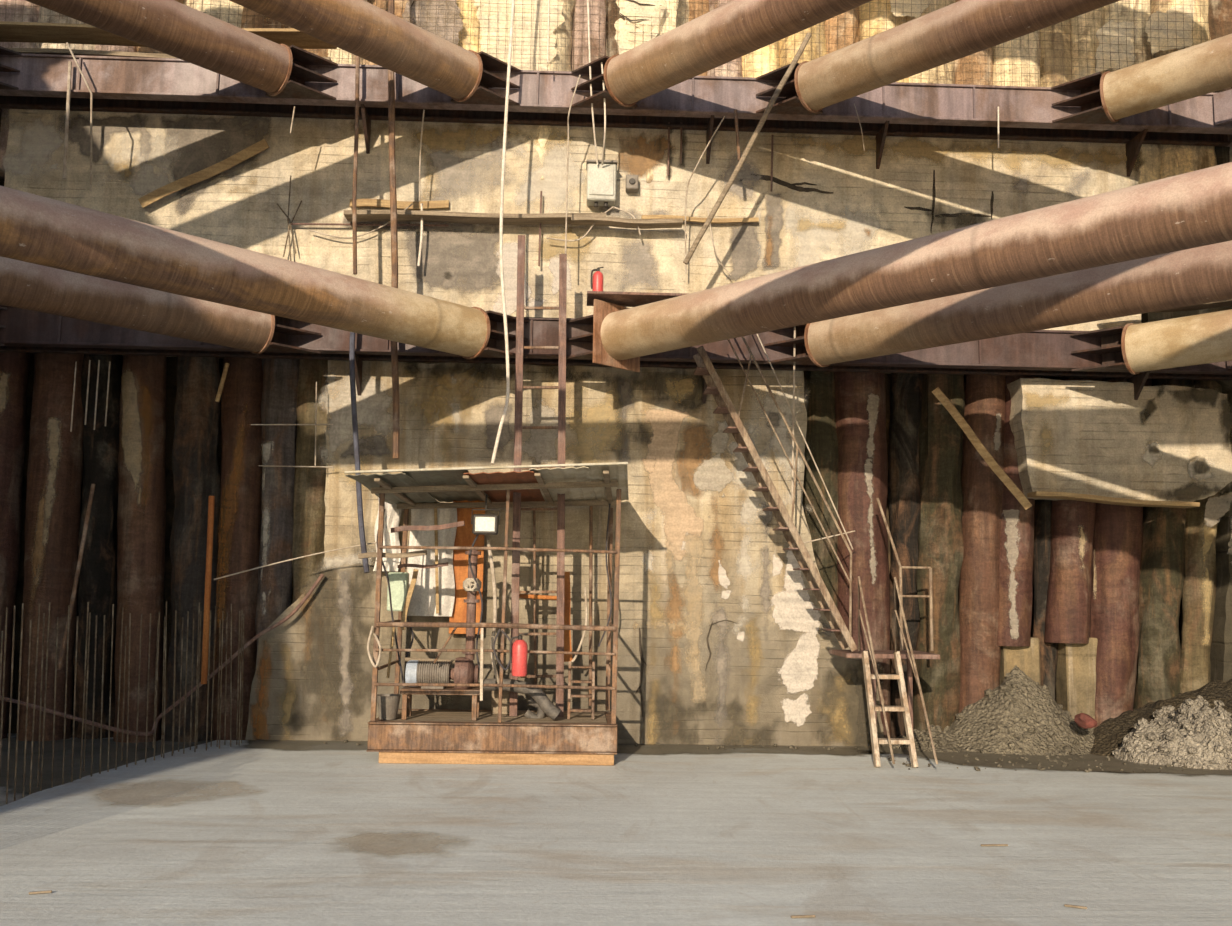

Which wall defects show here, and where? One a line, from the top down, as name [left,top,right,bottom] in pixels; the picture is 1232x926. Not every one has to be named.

spalling [402,0,463,45]
water stain [4,115,270,214]
crack [741,175,834,194]
water stain [321,374,391,483]
corrosion [677,426,712,495]
water stain [281,549,376,740]